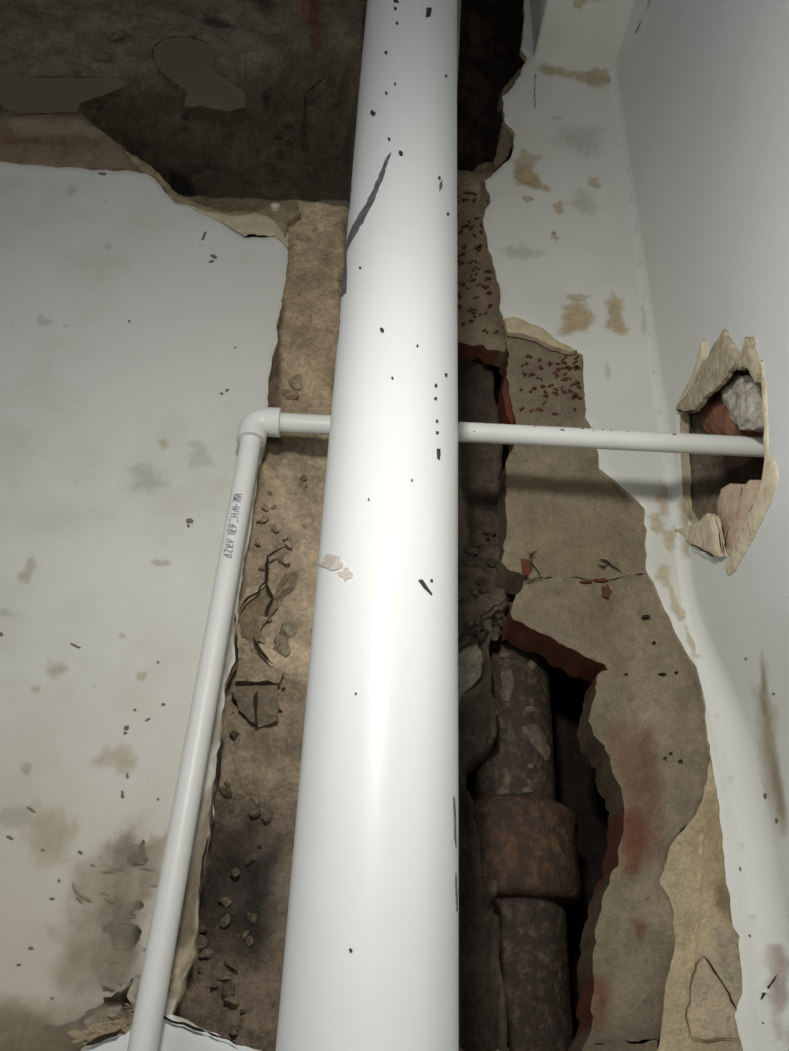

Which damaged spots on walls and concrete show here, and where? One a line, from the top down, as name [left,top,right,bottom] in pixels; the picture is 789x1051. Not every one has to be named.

peeling [0,73,301,247]
peeling [152,36,246,111]
spalling [447,66,588,428]
spalling [675,329,778,576]
crack [227,614,239,680]
spalling [231,491,300,728]
crack [524,551,542,583]
crack [579,559,630,600]
crack [198,711,225,897]
spalling [458,444,742,1051]
spalling [193,922,246,1037]
spalling [217,897,258,947]